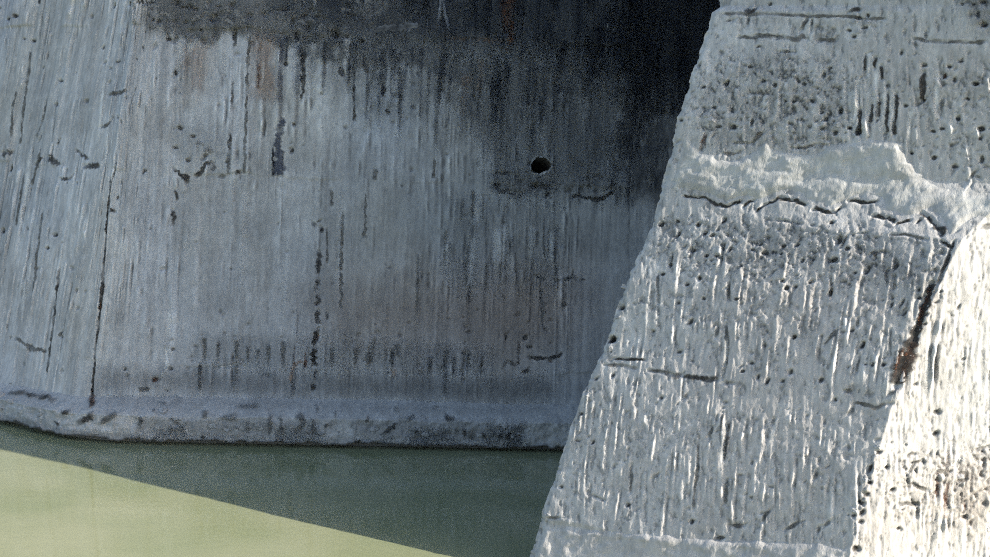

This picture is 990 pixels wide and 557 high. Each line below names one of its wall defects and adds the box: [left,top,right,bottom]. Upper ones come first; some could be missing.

leakage [159,0,720,193]
crack [685,195,955,412]